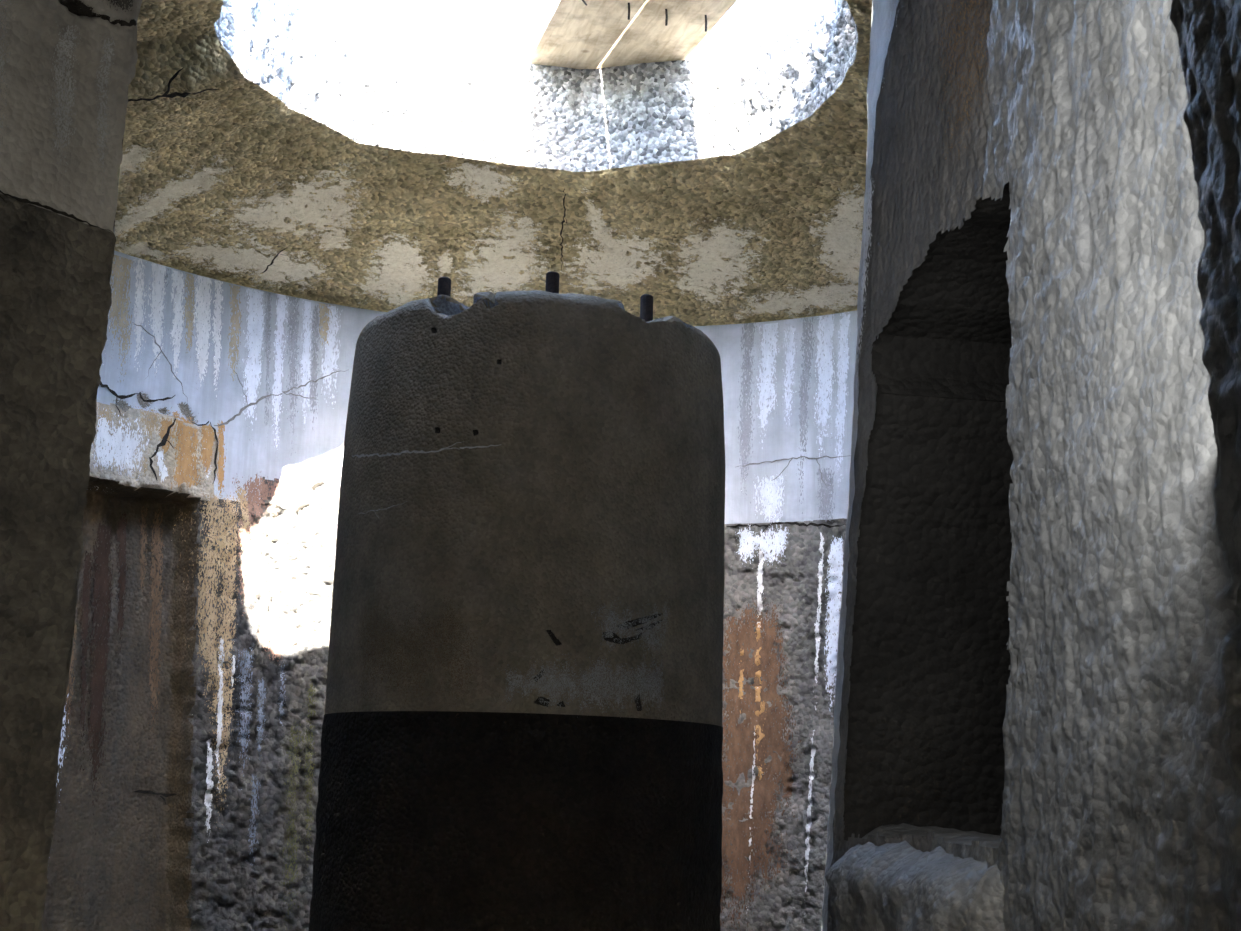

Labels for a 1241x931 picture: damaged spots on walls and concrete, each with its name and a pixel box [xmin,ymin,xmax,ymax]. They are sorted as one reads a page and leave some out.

crack [100,15,137,27]
crack [0,190,113,233]
damp [91,408,169,492]
spalling [113,393,198,425]
damp [102,255,342,455]
crack [100,322,349,512]
damp [734,0,899,725]
rust [65,404,296,828]
damp [204,638,317,931]
damp [748,732,756,886]
rust [720,598,804,931]
damp [804,730,816,892]